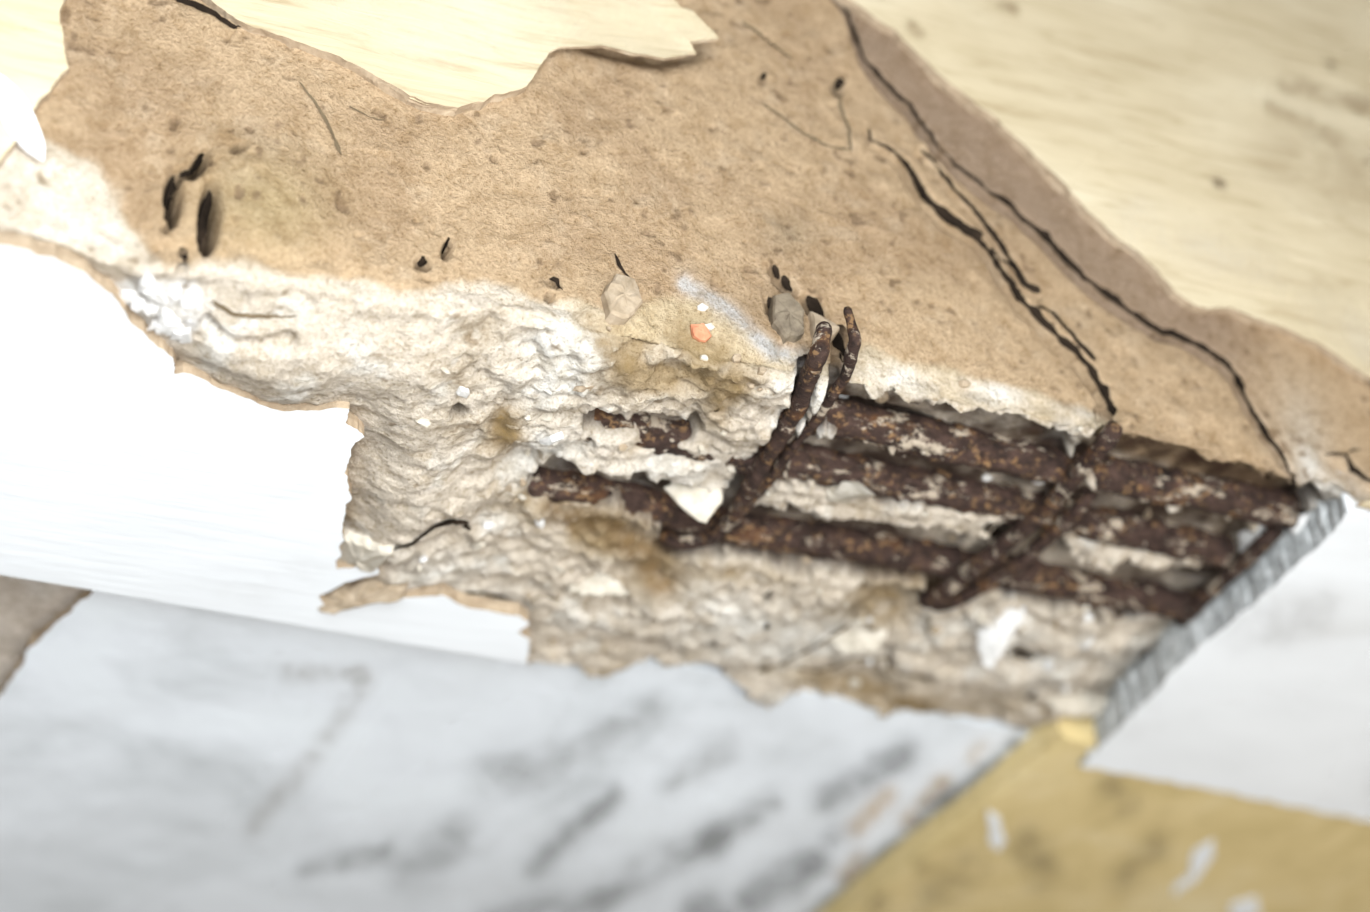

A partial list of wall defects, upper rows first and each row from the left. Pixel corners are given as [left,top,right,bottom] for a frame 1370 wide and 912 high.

peeling [516,0,719,88]
spalling [196,190,212,245]
spalling [600,274,643,325]
crack [762,7,1308,514]
spalling [787,311,846,444]
crack [393,519,471,550]
spalling [664,482,723,524]
spalling [747,460,1014,552]
spalling [1037,472,1269,591]
crack [1326,449,1370,482]
spalling [0,575,88,687]
spalling [976,606,1026,670]